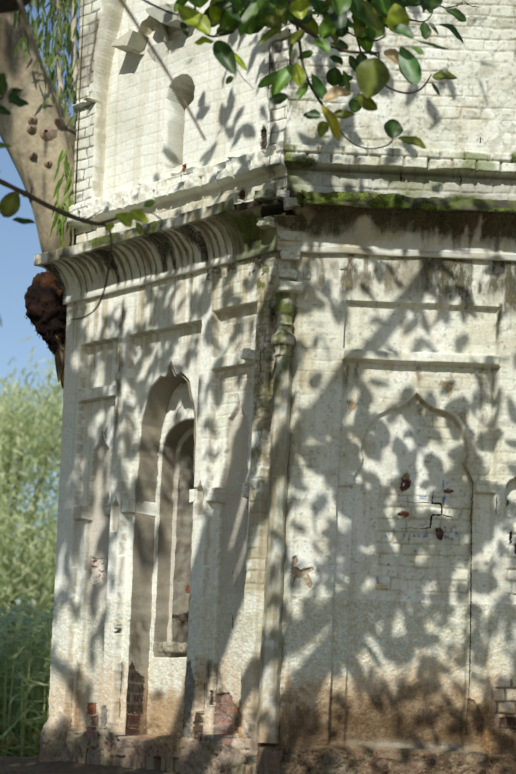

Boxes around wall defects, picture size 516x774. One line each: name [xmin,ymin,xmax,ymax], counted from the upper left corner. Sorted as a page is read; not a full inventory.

water stain [274,206,516,248]
water stain [341,254,397,290]
water stain [422,258,516,338]
spalling [400,471,413,492]
crack [401,491,451,529]
spalling [434,527,444,542]
spalling [288,554,314,591]
crack [463,464,474,703]
spalling [125,662,149,742]
spalling [182,660,243,744]
water stain [288,697,474,768]
spalling [498,715,516,731]